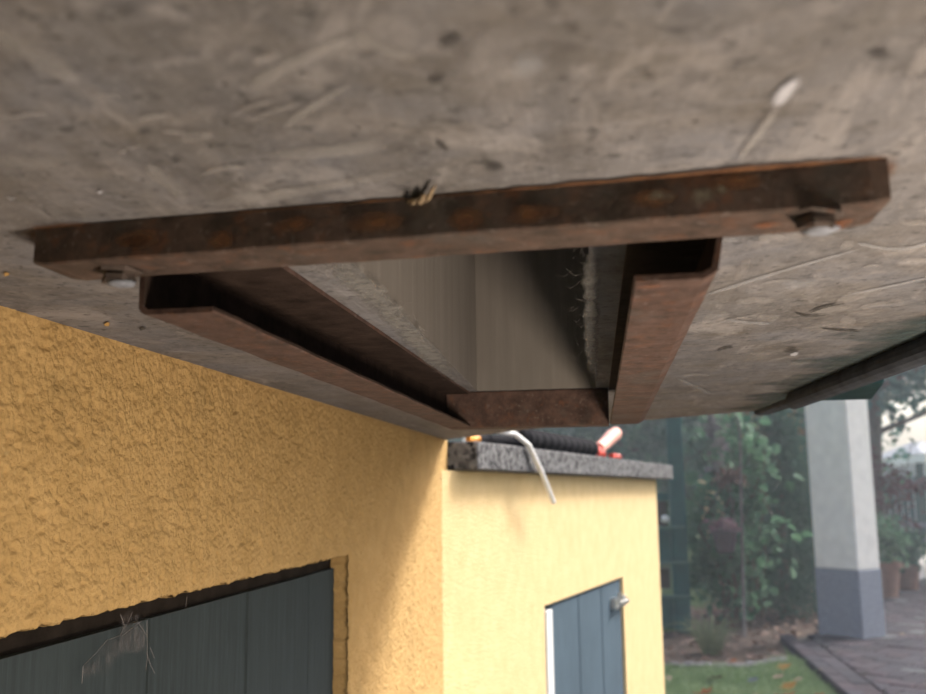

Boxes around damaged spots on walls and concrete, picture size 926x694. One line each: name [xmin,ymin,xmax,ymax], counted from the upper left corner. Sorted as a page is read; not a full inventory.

corrosion [460,159,854,195]